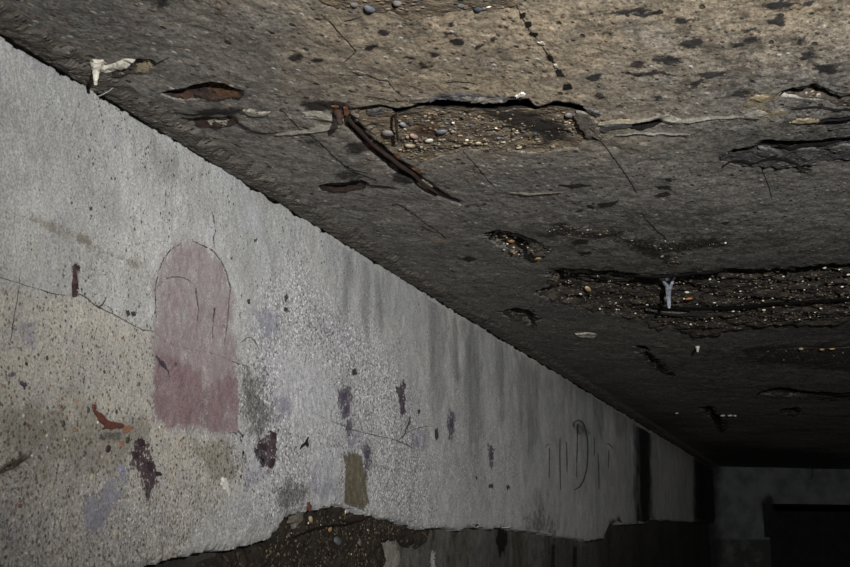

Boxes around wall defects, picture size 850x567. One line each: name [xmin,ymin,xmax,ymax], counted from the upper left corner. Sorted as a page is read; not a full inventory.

spalling [162,82,244,101]
rust [327,103,353,117]
crack [174,5,637,193]
spalling [318,106,602,204]
spalling [718,84,850,172]
crack [0,277,246,366]
spalling [484,222,850,337]
spalling [195,464,430,567]